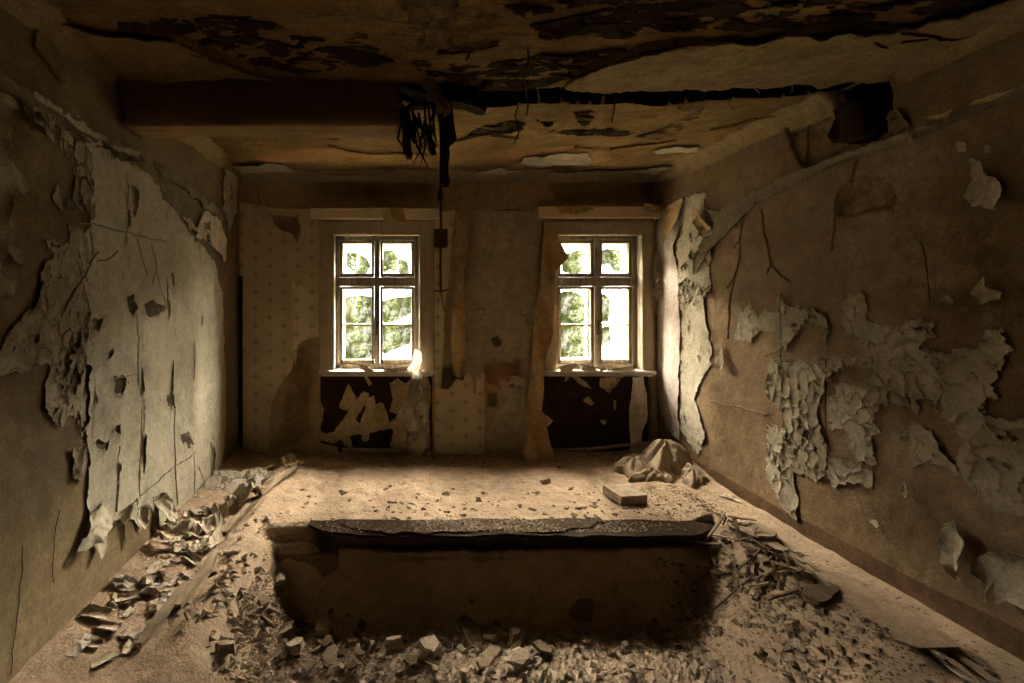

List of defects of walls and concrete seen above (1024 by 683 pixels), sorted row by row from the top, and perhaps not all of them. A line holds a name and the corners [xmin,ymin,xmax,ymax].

flaking render [60,14,395,84]
peeling [0,70,226,668]
peeling [320,376,436,460]
flaking render [410,0,1024,455]
crack [709,209,792,428]
crack [830,159,860,251]
peeling [734,289,1024,521]
peeling [937,520,1024,610]